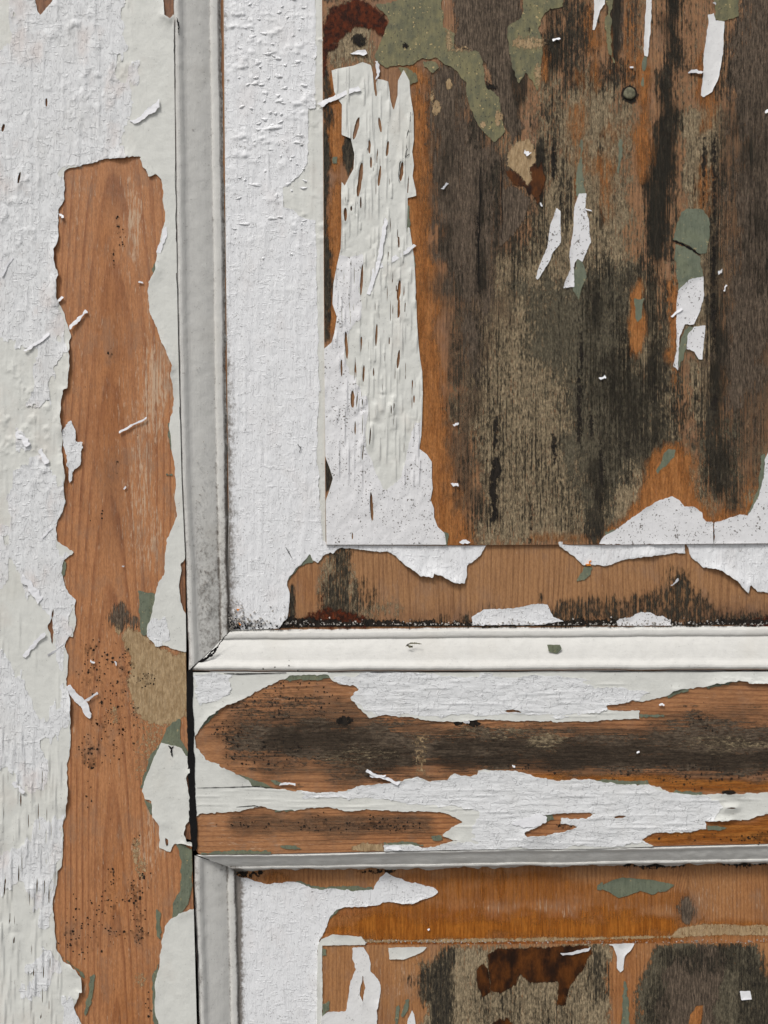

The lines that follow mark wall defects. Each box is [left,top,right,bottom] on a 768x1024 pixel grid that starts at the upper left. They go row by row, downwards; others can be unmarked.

peeling [285,0,768,627]
mould [318,548,379,621]
peeling [48,156,768,1024]
leakage [436,612,526,629]
leakage [541,567,768,629]
leakage [214,665,768,792]